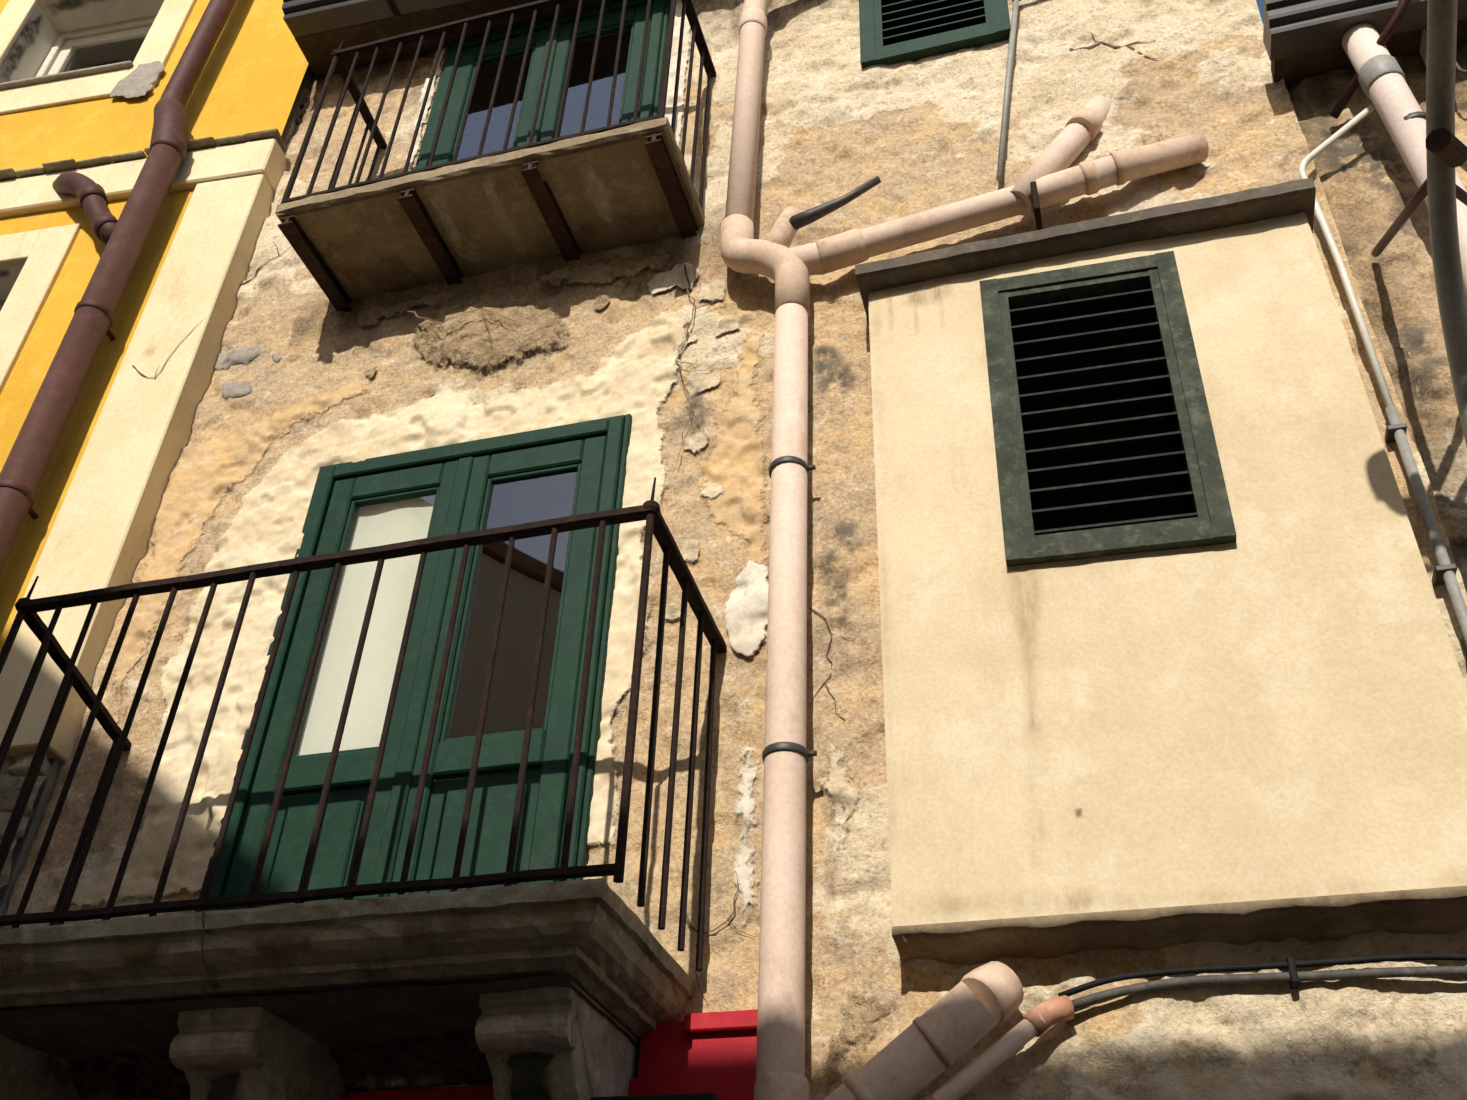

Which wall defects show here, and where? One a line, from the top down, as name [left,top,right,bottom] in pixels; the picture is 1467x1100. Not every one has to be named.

crack [1069,31,1159,59]
flaking render [646,261,726,301]
crack [673,265,739,471]
flaking render [27,312,740,913]
crack [809,607,855,720]